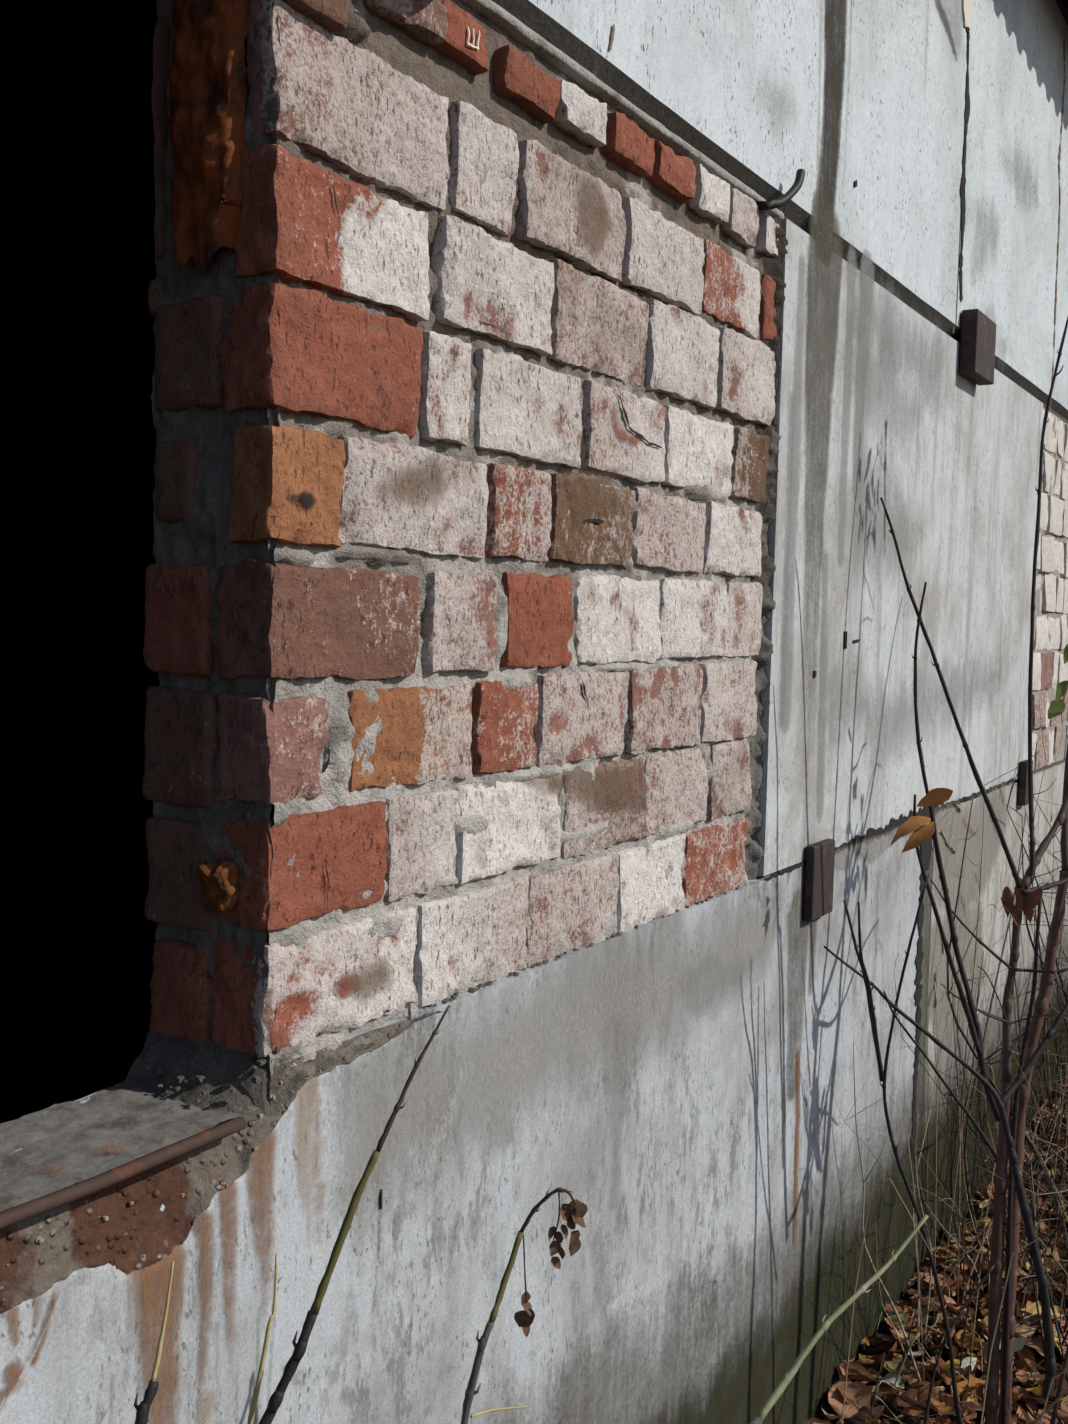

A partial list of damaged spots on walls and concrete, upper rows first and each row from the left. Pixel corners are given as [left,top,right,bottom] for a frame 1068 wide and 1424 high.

crack [960,27,970,302]
damp [781,0,937,817]
spalling [0,885,740,1313]
rust [0,1299,56,1404]
rust [130,1132,276,1424]